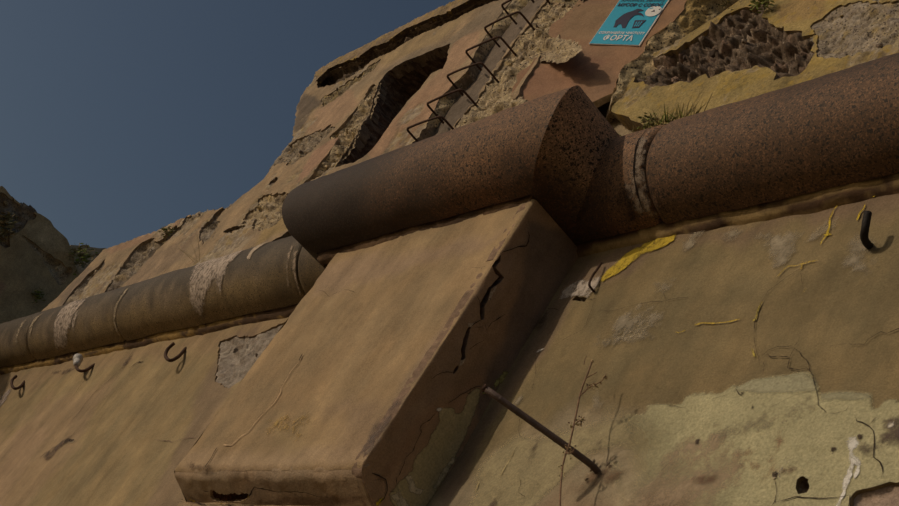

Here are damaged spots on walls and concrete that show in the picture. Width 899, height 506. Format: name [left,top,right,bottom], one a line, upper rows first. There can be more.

spalling [637,0,899,87]
spalling [216,325,283,388]
crack [372,232,530,505]
crack [754,264,883,477]
crack [180,486,318,506]
peeling [390,388,480,506]
peeling [473,372,899,506]